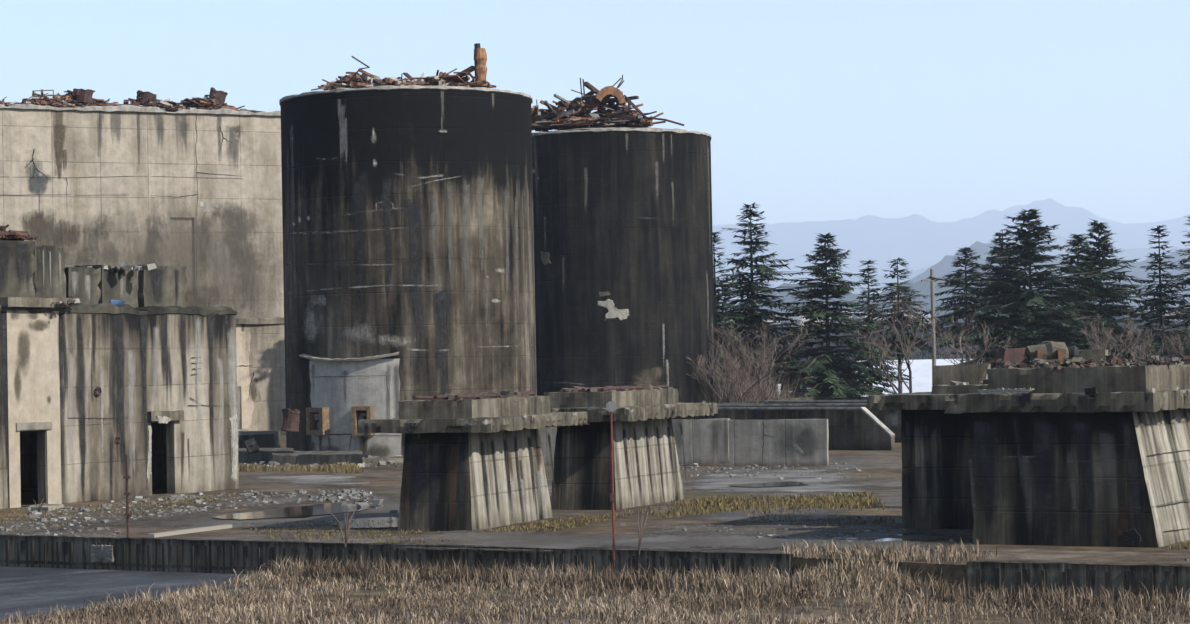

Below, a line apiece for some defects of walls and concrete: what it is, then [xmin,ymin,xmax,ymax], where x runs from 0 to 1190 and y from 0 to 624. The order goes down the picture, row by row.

leakage [26,111,67,194]
leakage [656,134,672,192]
leakage [0,309,15,484]
leakage [0,213,105,289]
leakage [50,312,96,496]
leakage [109,314,125,494]
leakage [147,231,162,301]
leakage [140,270,244,464]
leakage [362,423,389,457]
leakage [287,126,483,395]
leakage [486,138,588,366]
spalling [597,291,630,320]